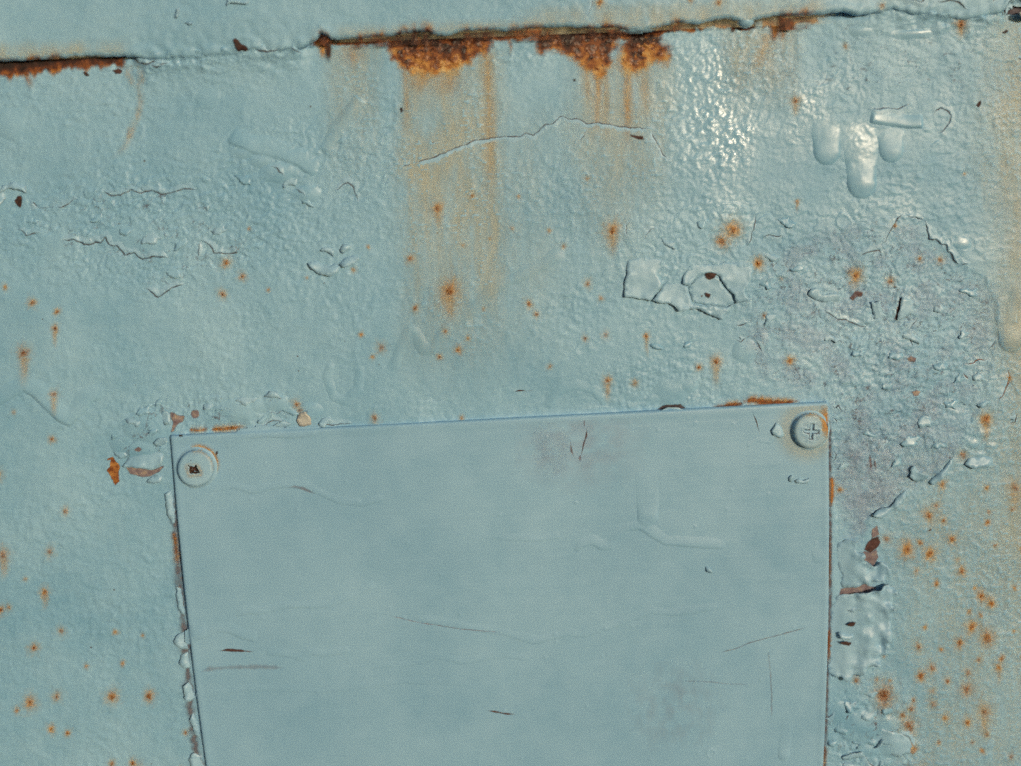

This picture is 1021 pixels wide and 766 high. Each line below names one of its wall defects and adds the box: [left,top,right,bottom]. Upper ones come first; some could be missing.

rust [0,55,125,79]
rust [313,10,818,119]
crack [401,116,669,167]
peeling [624,257,771,320]
peeling [808,288,915,321]
peeling [236,391,333,428]
peeling [107,399,228,485]
peeling [891,406,953,485]
rust [903,541,934,560]
peeling [828,486,906,683]
rust [968,610,992,643]
peeling [828,689,917,766]